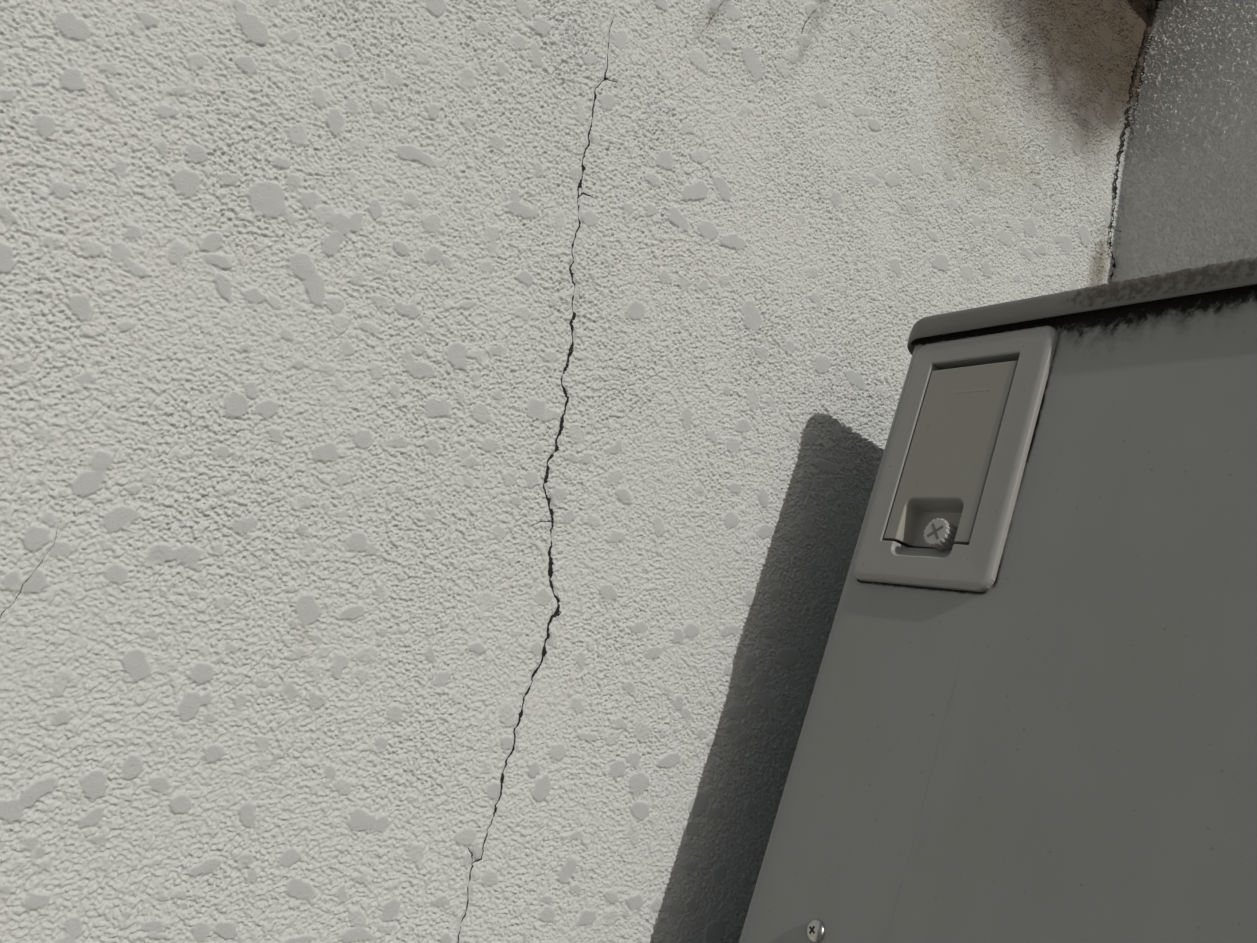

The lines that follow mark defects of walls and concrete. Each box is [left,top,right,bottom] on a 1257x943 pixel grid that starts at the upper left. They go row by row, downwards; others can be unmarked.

crack [457,17,618,943]
damp [1010,0,1160,130]